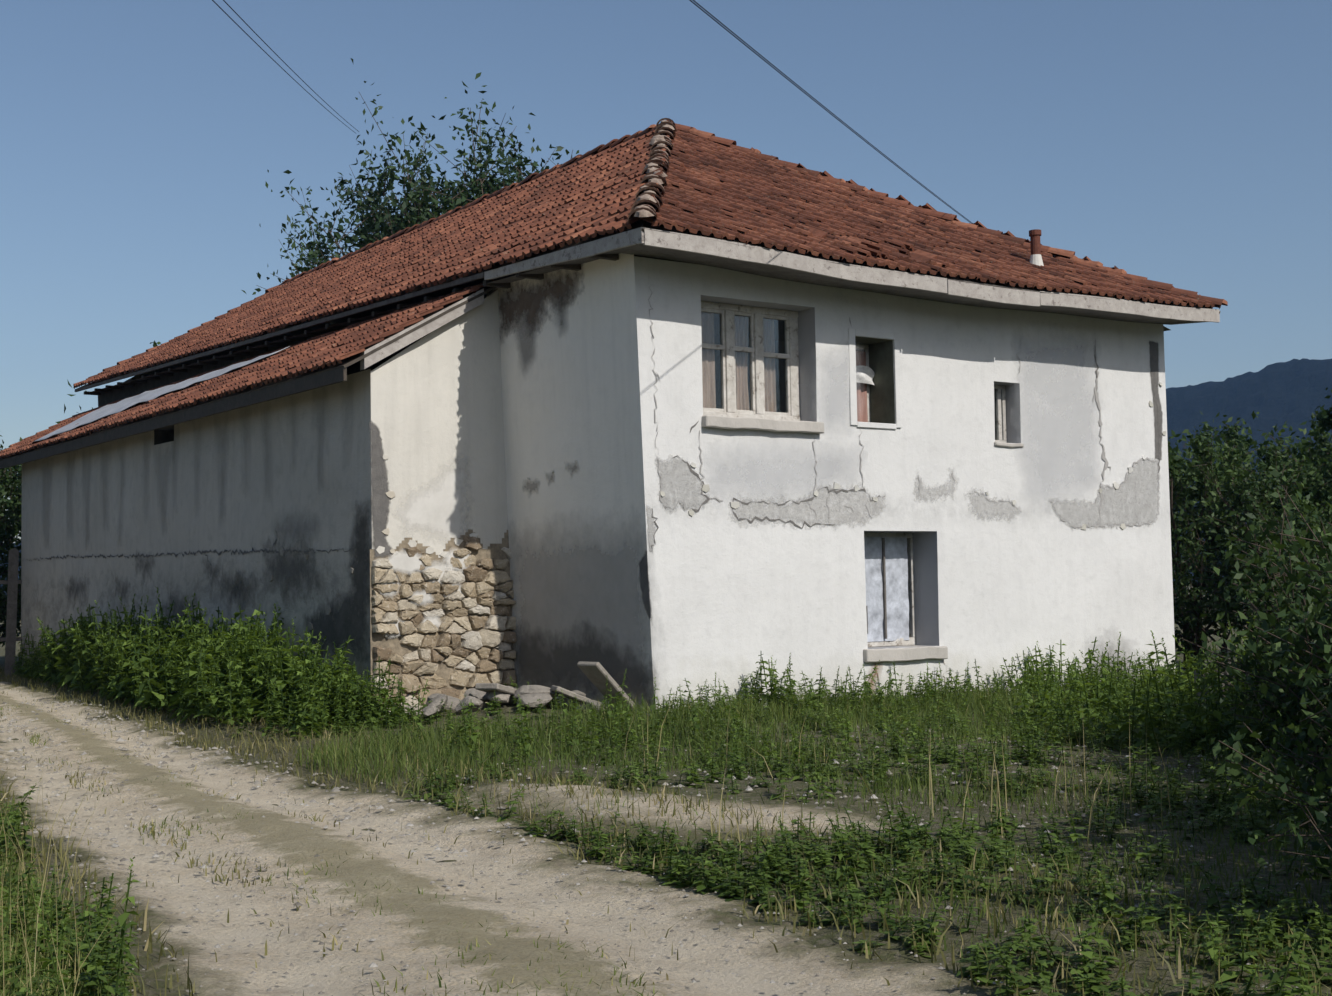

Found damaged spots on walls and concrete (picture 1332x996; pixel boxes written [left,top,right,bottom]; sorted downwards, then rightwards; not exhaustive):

flaking render [308,421,517,716]
damp [498,271,578,333]
crack [648,277,661,454]
crack [690,422,705,494]
spalling [639,455,886,619]
spalling [915,472,956,500]
spalling [970,491,1020,519]
crack [1093,339,1111,522]
spalling [1051,341,1166,530]